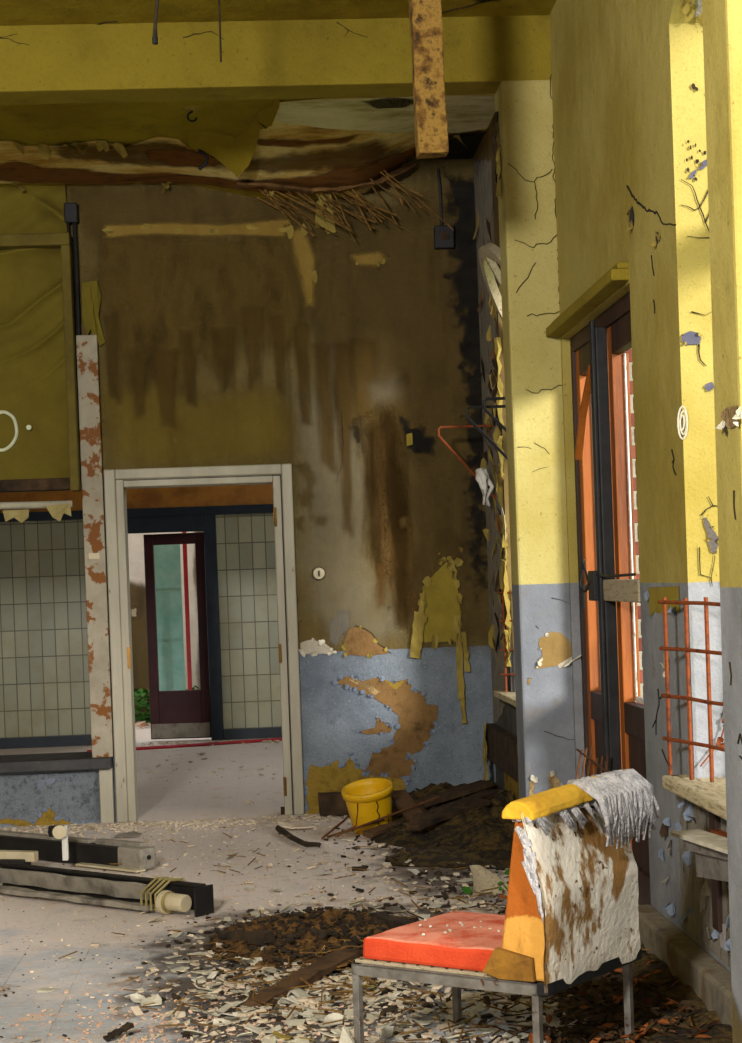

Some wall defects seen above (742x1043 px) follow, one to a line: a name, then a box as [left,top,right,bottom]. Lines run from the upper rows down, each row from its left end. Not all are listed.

peeling [0,96,418,196]
spalling [102,192,336,305]
crack [626,179,709,238]
peeling [681,331,701,345]
water stain [84,176,490,640]
peeling [445,94,512,781]
spalling [677,406,688,440]
spalling [299,611,388,658]
peeling [410,532,471,723]
peeling [527,632,582,685]
peeling [305,674,438,814]
peeling [147,916,586,1043]